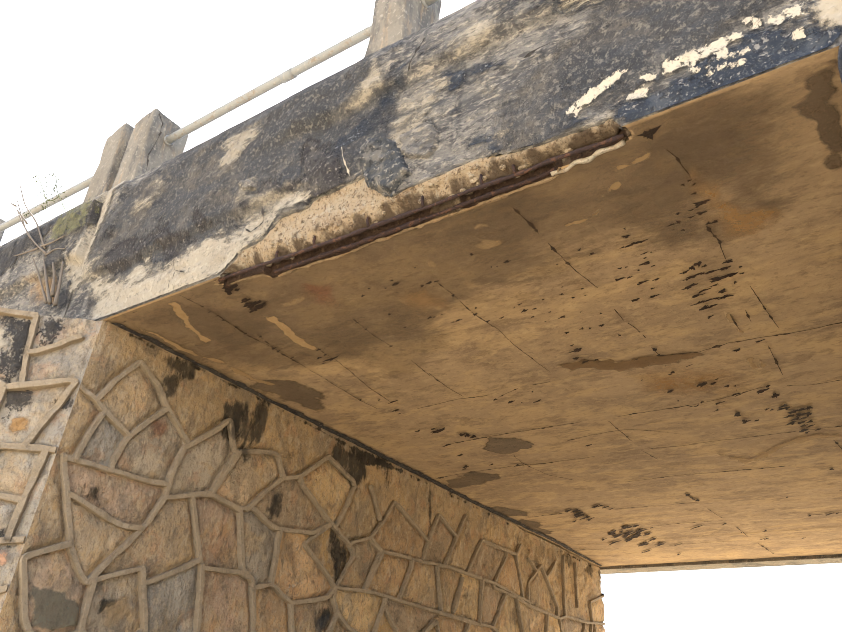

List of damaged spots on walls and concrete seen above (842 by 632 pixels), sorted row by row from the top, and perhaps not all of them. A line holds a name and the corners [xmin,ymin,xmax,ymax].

peeling [566,69,628,117]
leakage [610,77,714,123]
peeling [618,0,808,102]
leakage [794,60,842,169]
leakage [811,0,842,28]
leakage [65,181,311,343]
spalling [218,119,661,313]
crack [411,282,547,409]
crack [513,208,598,288]
spalling [680,259,744,319]
crack [614,286,842,386]
crack [431,386,842,482]